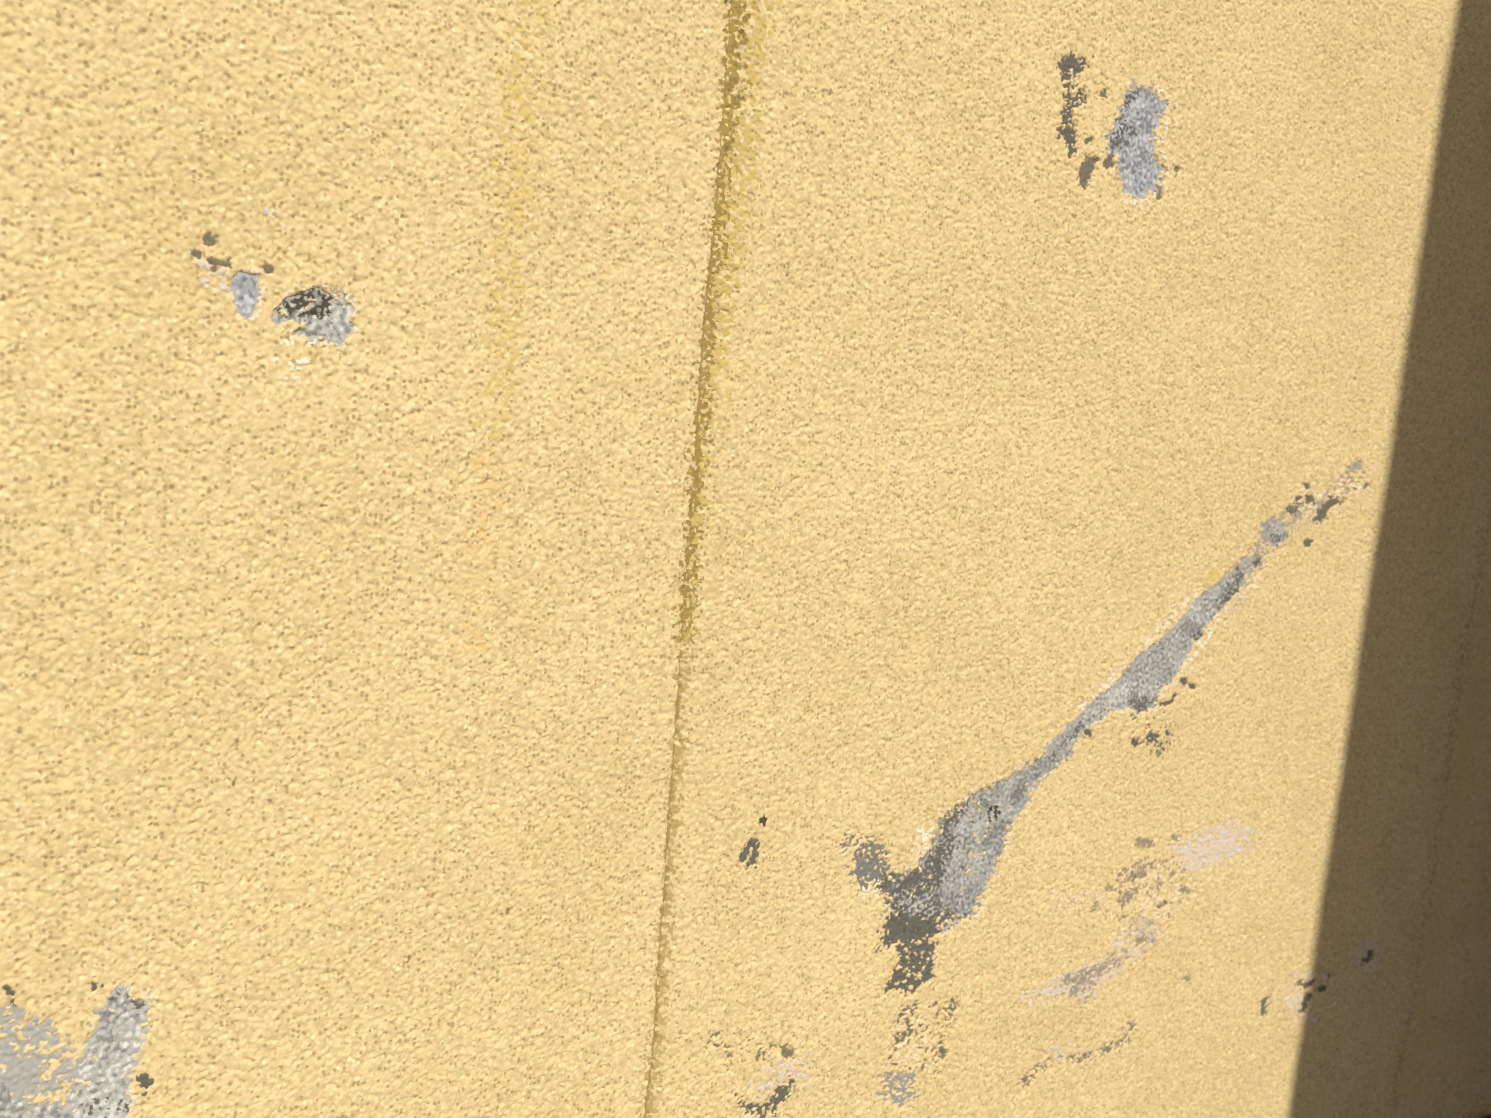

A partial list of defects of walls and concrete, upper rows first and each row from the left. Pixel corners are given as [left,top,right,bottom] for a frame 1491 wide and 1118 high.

peeling [1056,49,1180,201]
peeling [190,232,358,350]
crack [644,0,734,1118]
peeling [1289,481,1344,548]
peeling [1123,678,1196,759]
peeling [836,830,896,896]
peeling [1021,831,1197,1009]
peeling [0,982,155,1118]